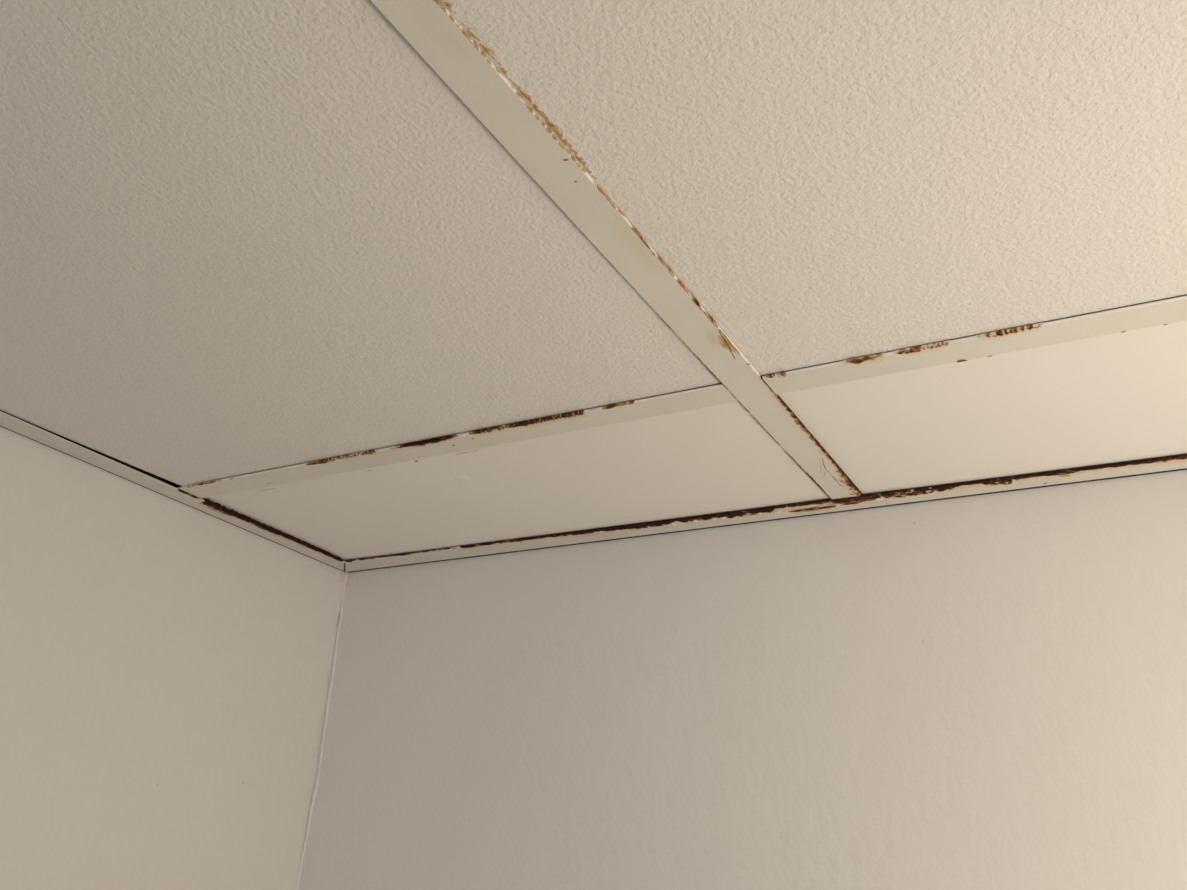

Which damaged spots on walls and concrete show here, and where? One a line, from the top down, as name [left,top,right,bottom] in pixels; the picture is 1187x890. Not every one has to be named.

rust [434,0,750,365]
rust [976,322,1043,343]
rust [178,340,1187,572]